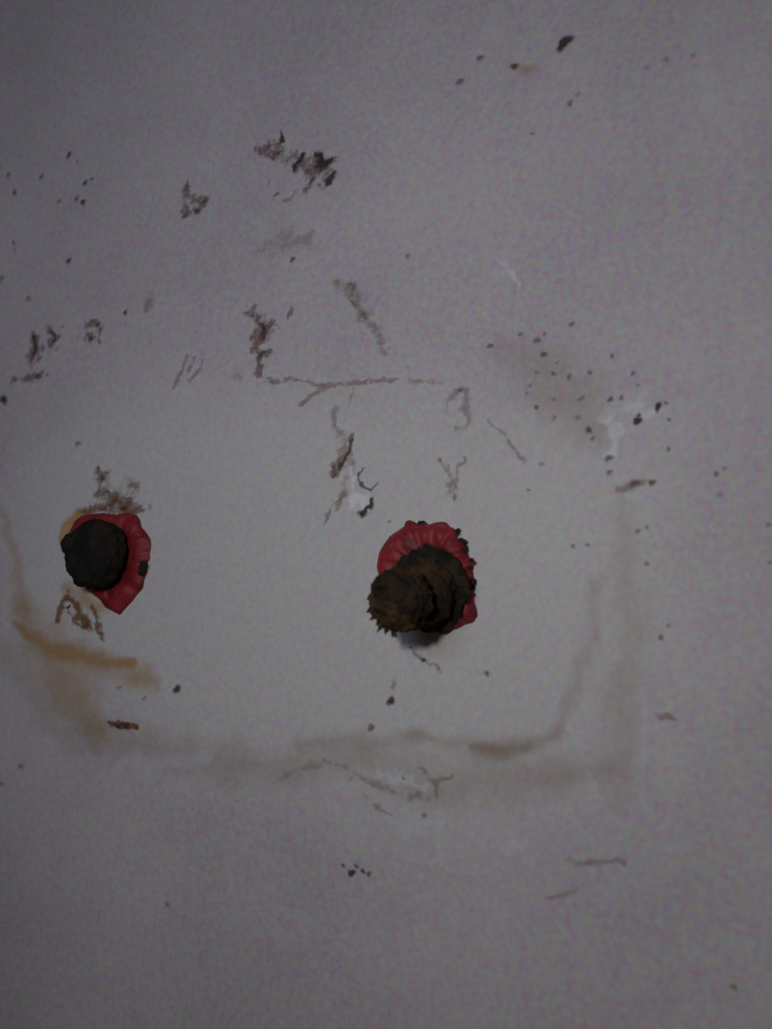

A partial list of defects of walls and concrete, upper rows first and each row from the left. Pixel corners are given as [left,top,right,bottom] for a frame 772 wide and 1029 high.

rust [366,609,397,638]